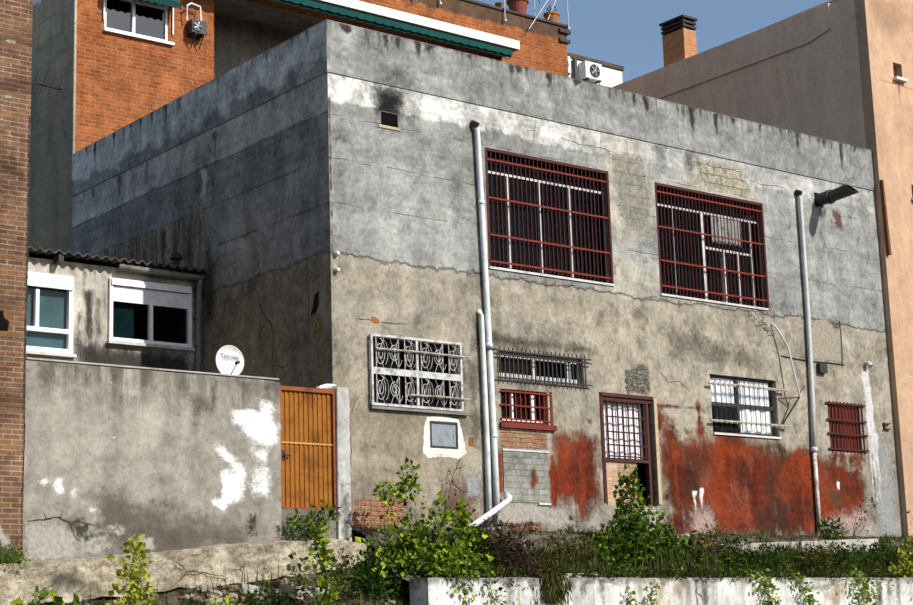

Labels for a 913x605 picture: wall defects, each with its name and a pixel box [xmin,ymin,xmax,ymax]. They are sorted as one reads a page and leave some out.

crack [21,117,100,541]
spalling [624,364,650,395]
flaking render [352,493,409,534]
peeling [498,429,602,531]
efflorescence [861,369,881,501]